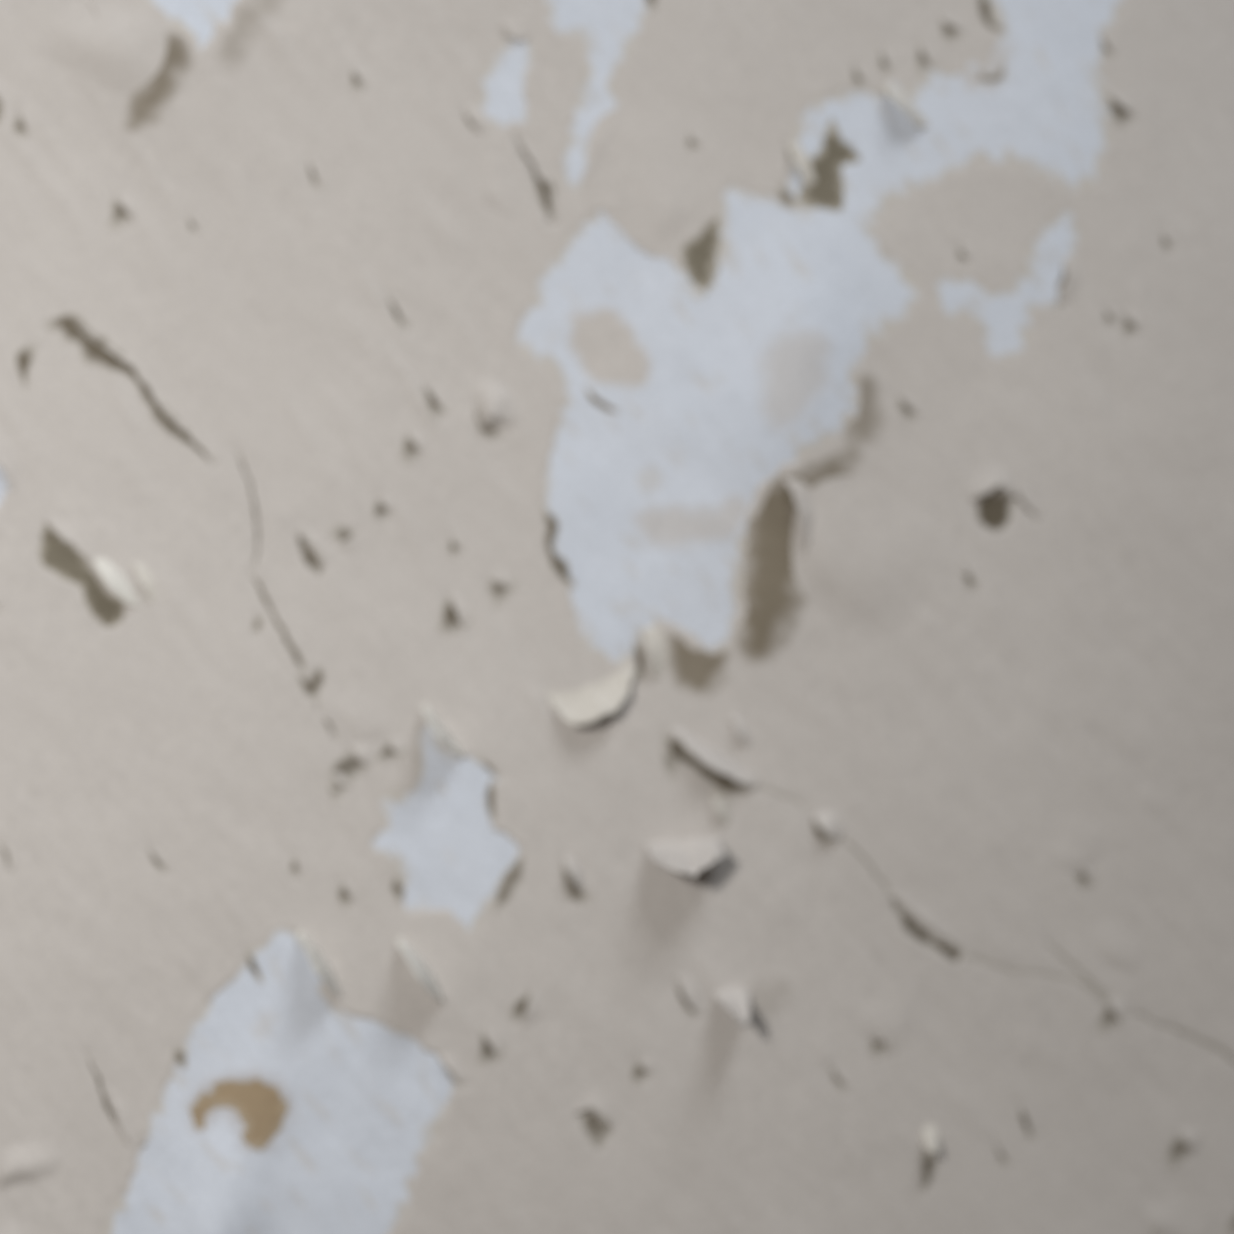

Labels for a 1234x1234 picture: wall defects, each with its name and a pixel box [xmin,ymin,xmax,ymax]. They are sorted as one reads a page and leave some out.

peeling [138,0,237,50]
peeling [463,0,656,194]
peeling [516,0,1137,726]
crack [15,312,338,741]
peeling [328,704,521,933]
rust [180,1062,301,1160]
peeling [102,928,467,1234]
peeling [477,987,546,1065]